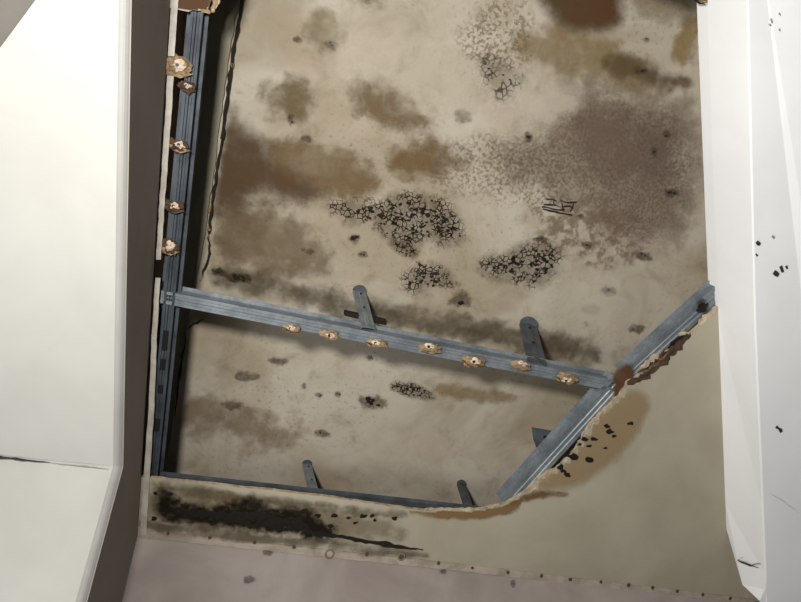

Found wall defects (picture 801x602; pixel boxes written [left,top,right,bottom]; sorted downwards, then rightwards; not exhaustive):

spalling [166,0,210,64]
water stain [518,0,690,90]
water stain [276,82,308,123]
water stain [215,123,461,258]
mould [481,199,629,286]
spalling [140,75,181,490]
water stain [403,263,469,306]
water stain [391,383,432,399]
corrosion [613,365,634,397]
peeling [636,331,689,373]
water stain [414,394,646,519]
water stain [147,485,378,546]